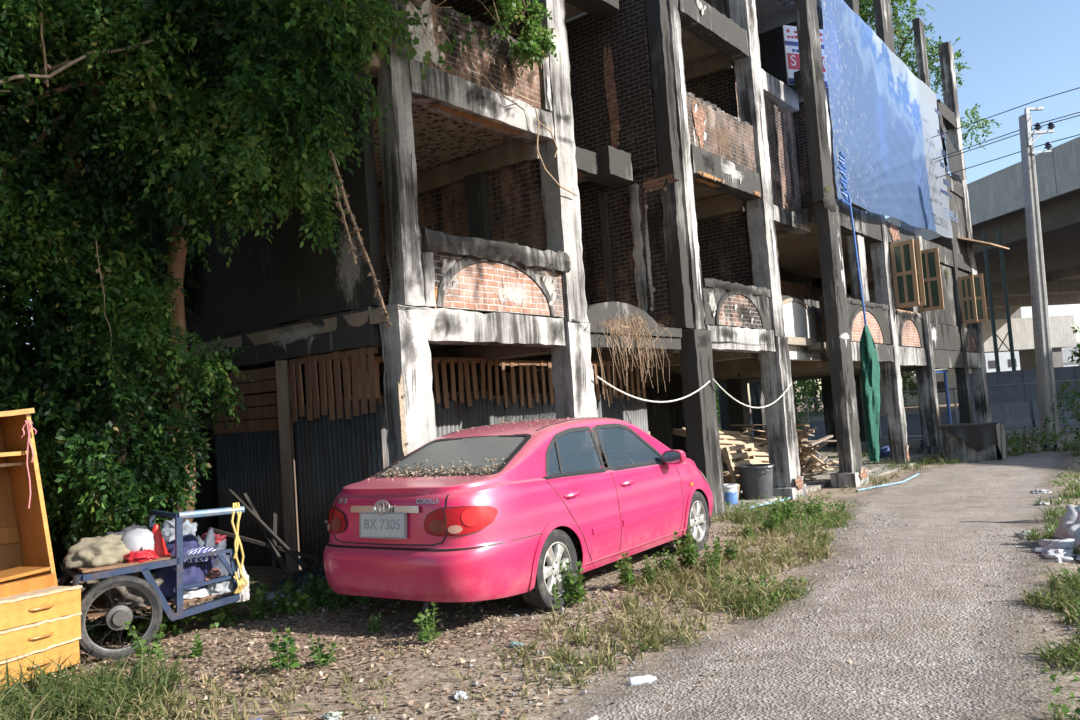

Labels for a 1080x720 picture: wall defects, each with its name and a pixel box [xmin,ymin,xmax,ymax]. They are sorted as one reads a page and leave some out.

flaking render [692,100,707,149]
water stain [448,240,555,278]
water stain [498,285,526,305]
water stain [436,314,455,334]
water stain [404,324,416,405]